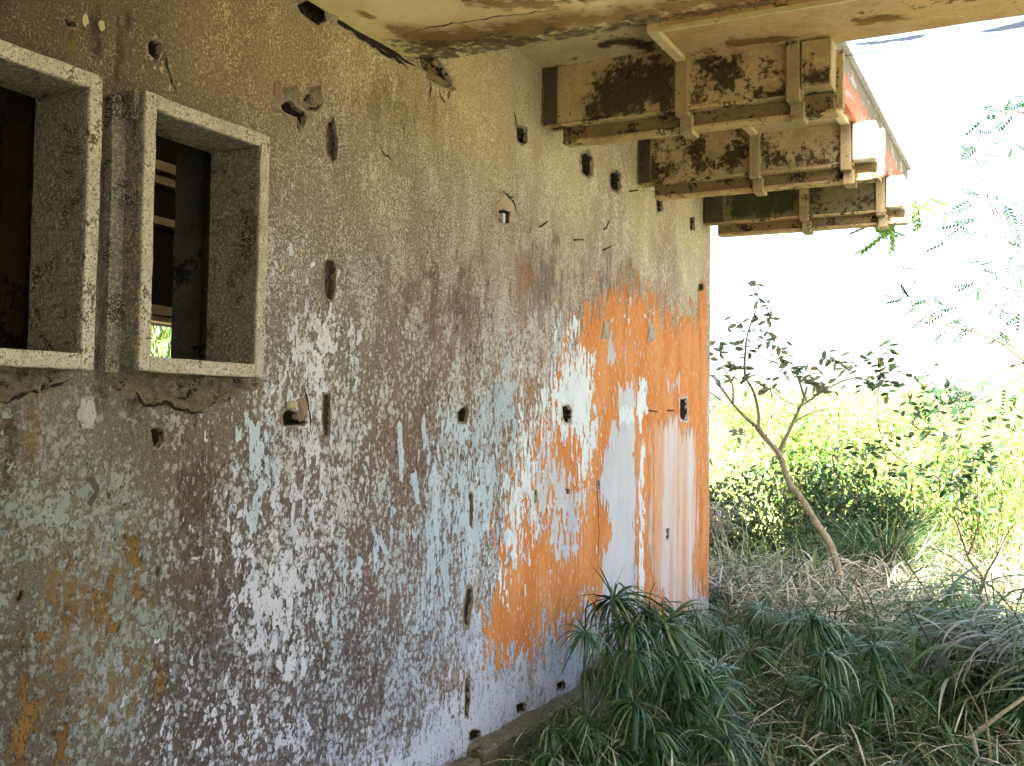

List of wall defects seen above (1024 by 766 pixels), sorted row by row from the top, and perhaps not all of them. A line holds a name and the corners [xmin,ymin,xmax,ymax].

damp [852,15,903,26]
flaking render [416,56,456,91]
damp [354,0,795,122]
damp [802,52,829,85]
flaking render [271,80,338,167]
damp [651,133,748,181]
damp [762,135,839,170]
damp [726,189,796,219]
spalling [0,368,71,408]
spalling [106,372,263,416]
flaking render [260,397,309,483]
peeling [410,271,710,742]